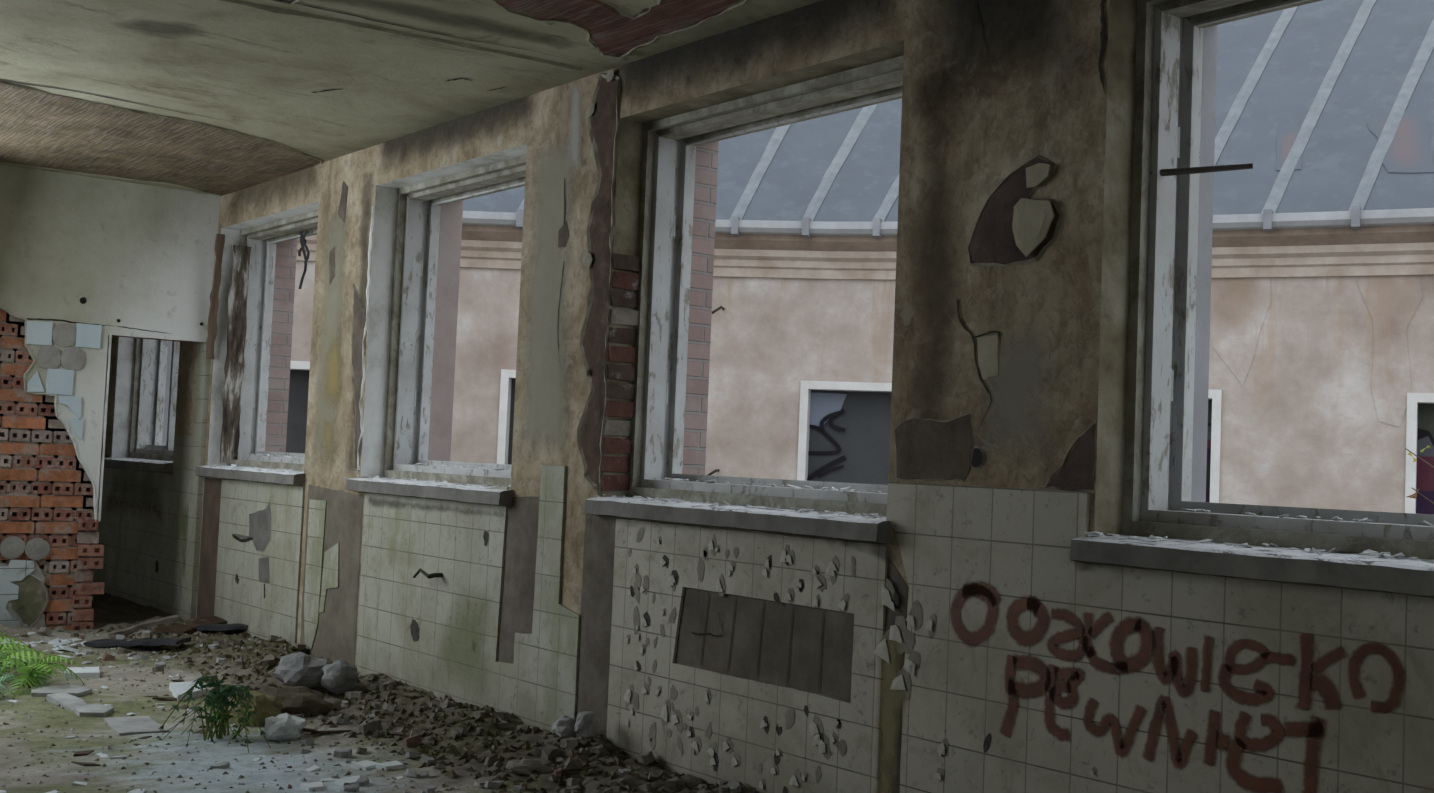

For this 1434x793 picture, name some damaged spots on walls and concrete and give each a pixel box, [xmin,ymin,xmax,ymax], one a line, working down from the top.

crack [1098,0,1107,93]
spalling [0,81,323,196]
flaking render [492,0,883,519]
flaking render [967,154,1063,267]
flaking render [0,304,98,630]
peeling [197,454,296,618]
peeling [300,485,363,664]
peeling [351,205,540,663]
peeling [575,514,856,793]
peeling [874,557,936,793]
flaking render [895,413,974,482]
crack [957,299,1001,431]